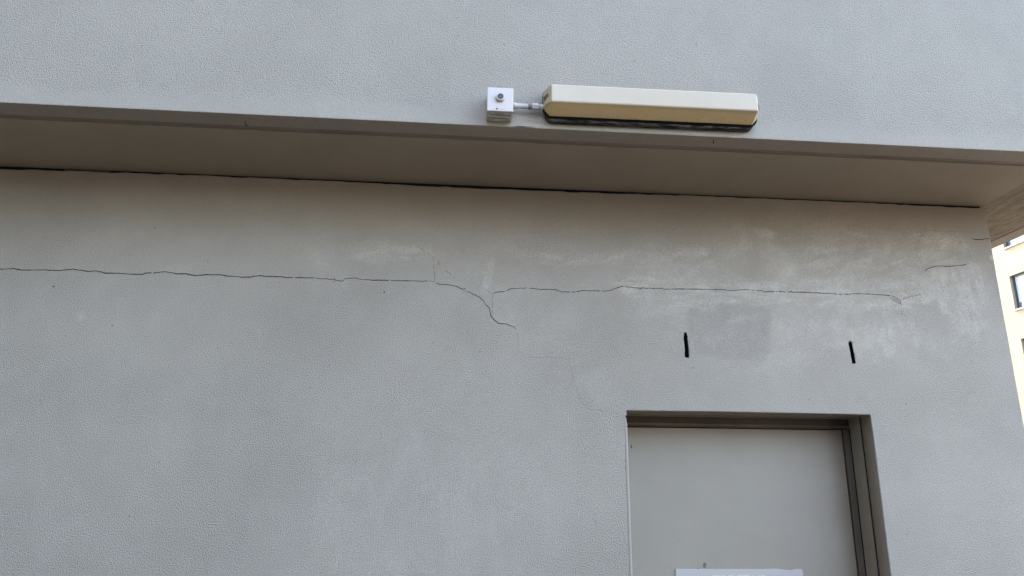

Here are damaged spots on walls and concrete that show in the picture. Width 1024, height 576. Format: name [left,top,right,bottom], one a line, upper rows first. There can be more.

crack [0,268,917,329]